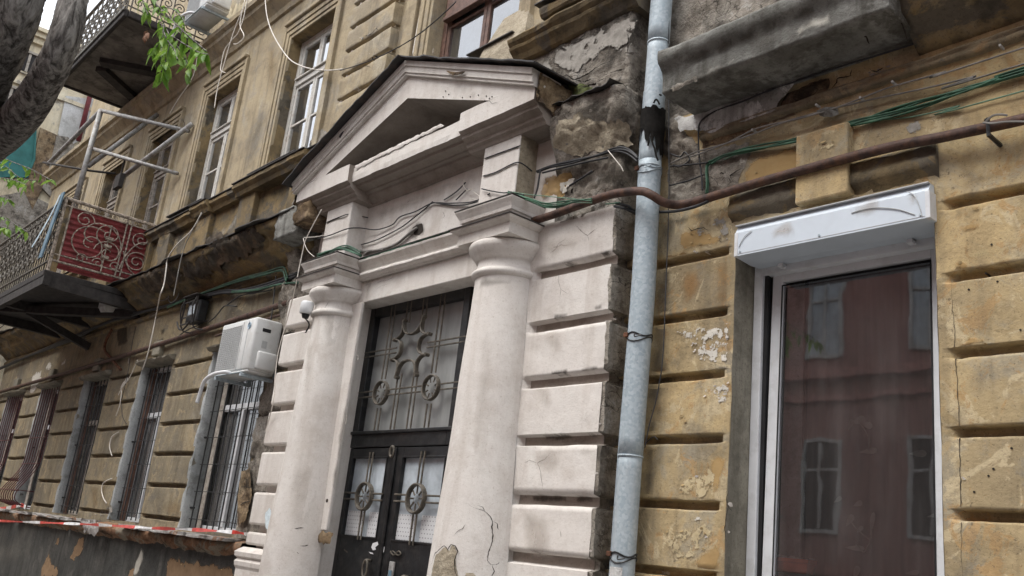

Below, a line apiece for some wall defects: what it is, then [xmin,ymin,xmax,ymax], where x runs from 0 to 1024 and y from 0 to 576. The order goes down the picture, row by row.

peeling [542,18,637,72]
spalling [553,106,633,157]
spalling [663,76,830,200]
peeling [541,172,575,198]
peeling [677,323,729,362]
peeling [679,457,724,497]
peeling [41,537,59,576]
peeling [70,537,84,561]
peeling [166,558,233,576]
spalling [431,544,475,576]
crack [433,506,499,575]
peeling [665,517,720,576]